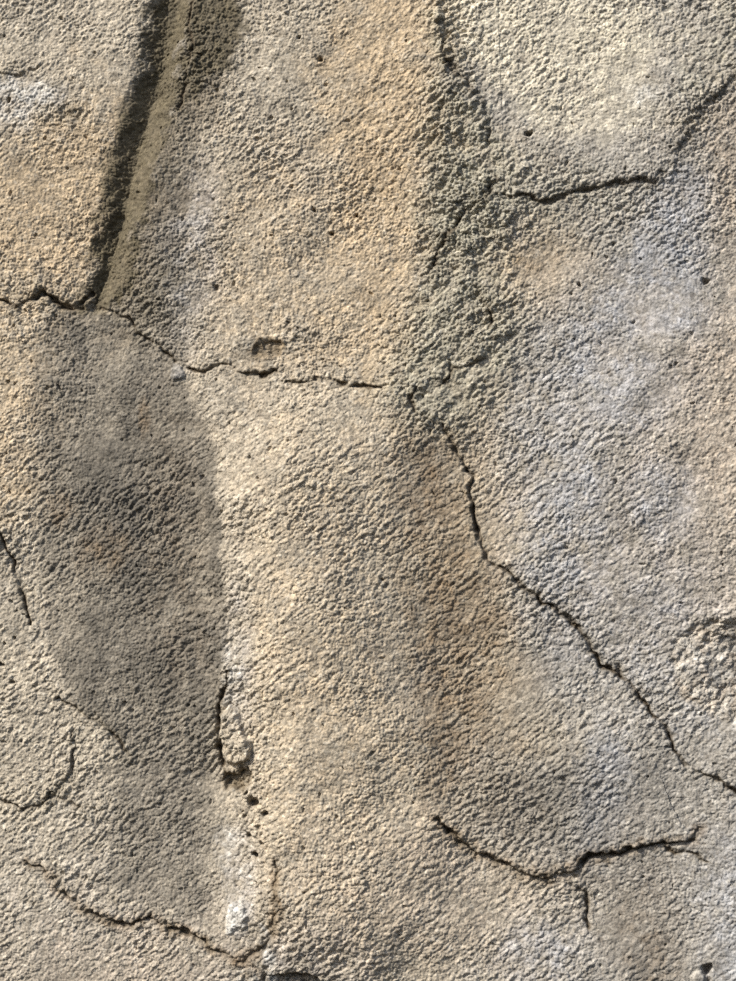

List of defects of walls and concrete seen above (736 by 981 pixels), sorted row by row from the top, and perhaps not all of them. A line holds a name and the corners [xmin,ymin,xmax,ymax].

crack [0,59,43,82]
damp [0,71,81,141]
damp [84,45,240,364]
crack [419,11,736,285]
crack [0,277,736,817]
damp [23,311,265,949]
spalling [662,614,736,738]
crack [18,854,286,970]
spalling [232,968,269,981]
crack [427,808,718,938]